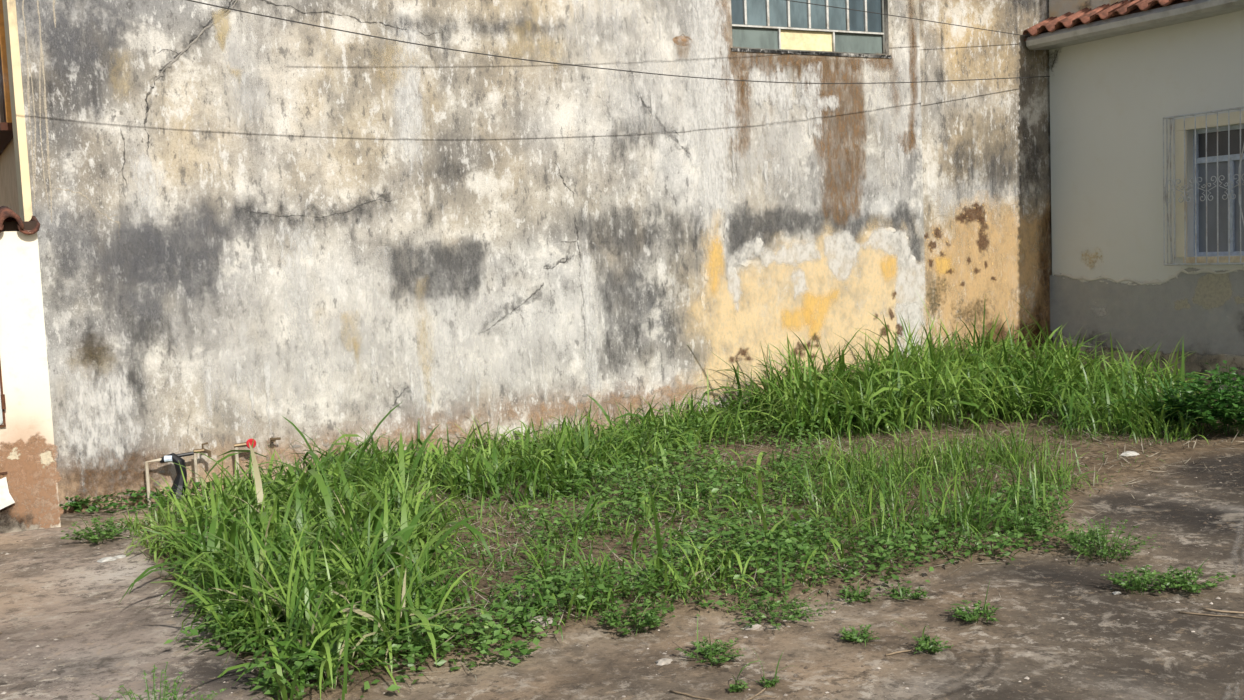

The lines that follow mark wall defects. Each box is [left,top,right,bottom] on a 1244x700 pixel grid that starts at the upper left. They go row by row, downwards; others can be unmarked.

peeling [529,203,1244,426]